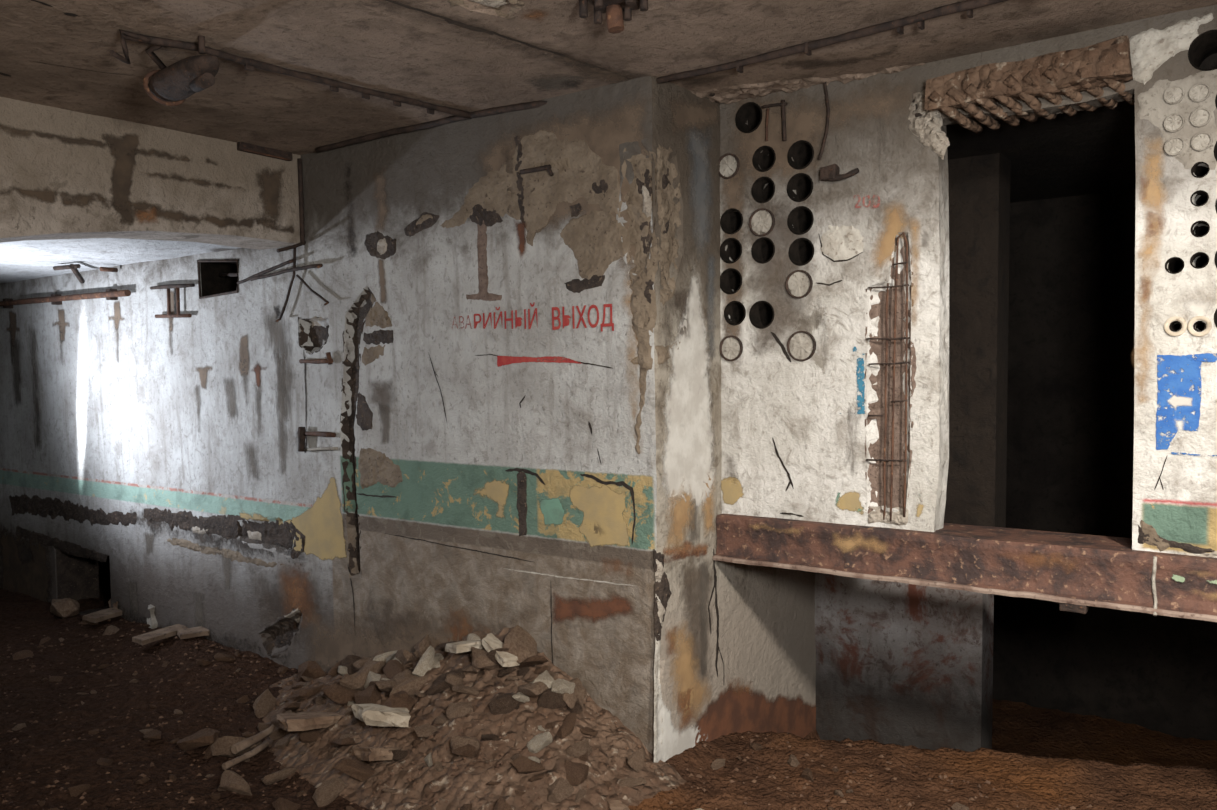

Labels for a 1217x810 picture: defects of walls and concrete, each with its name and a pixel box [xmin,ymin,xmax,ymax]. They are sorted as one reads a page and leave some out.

leakage [482,104,644,270]
spalling [908,89,950,160]
spalling [9,130,744,763]
spalling [836,232,924,526]
corrosion [553,594,632,622]
corrosion [665,542,816,745]
corrosion [837,538,885,550]